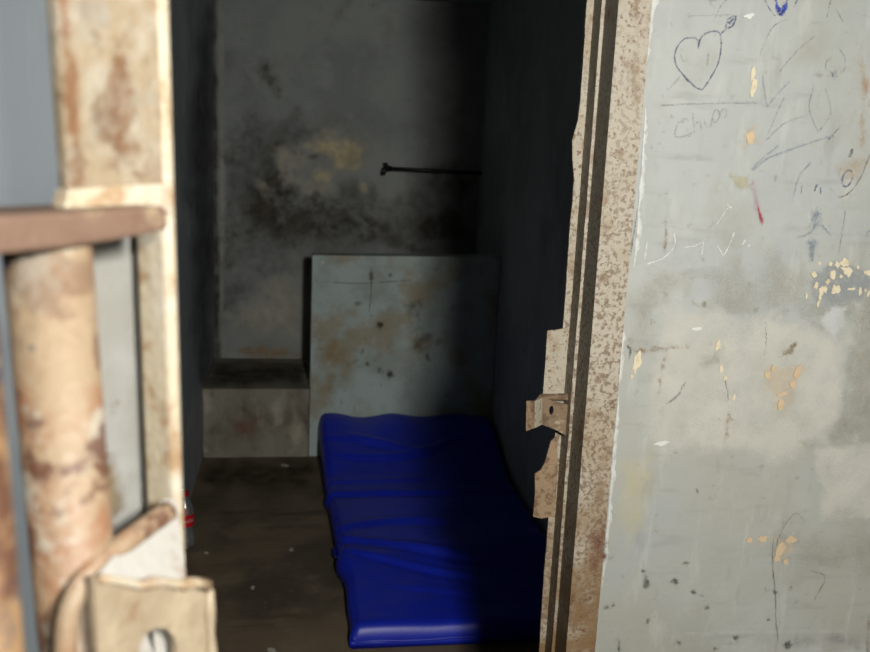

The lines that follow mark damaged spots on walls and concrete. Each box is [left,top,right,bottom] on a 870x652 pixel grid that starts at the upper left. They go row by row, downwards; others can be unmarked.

rust [55,0,149,188]
peeling [805,254,870,308]
rust [583,523,610,572]
spalling [746,533,797,565]
crack [772,513,801,637]